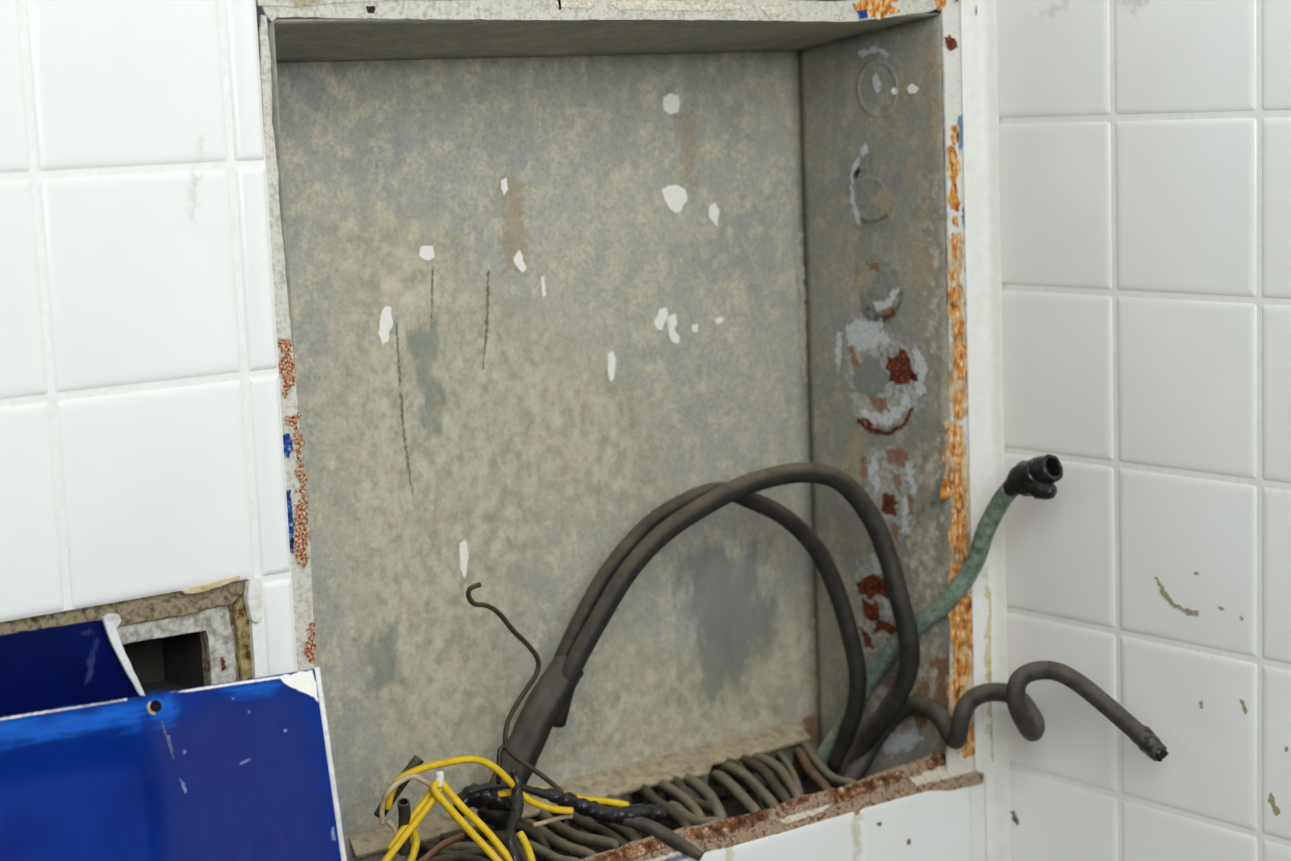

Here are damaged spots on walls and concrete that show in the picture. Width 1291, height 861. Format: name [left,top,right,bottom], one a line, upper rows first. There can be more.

peeling [610,0,785,15]
corrosion [945,35,958,51]
corrosion [278,338,296,398]
corrosion [940,125,971,585]
peeling [283,433,293,458]
corrosion [284,411,311,570]
spalling [0,575,319,720]
corrosion [947,592,974,715]
corrosion [925,713,975,771]
spalling [909,766,957,786]
spalling [779,803,833,824]
spalling [646,851,683,861]